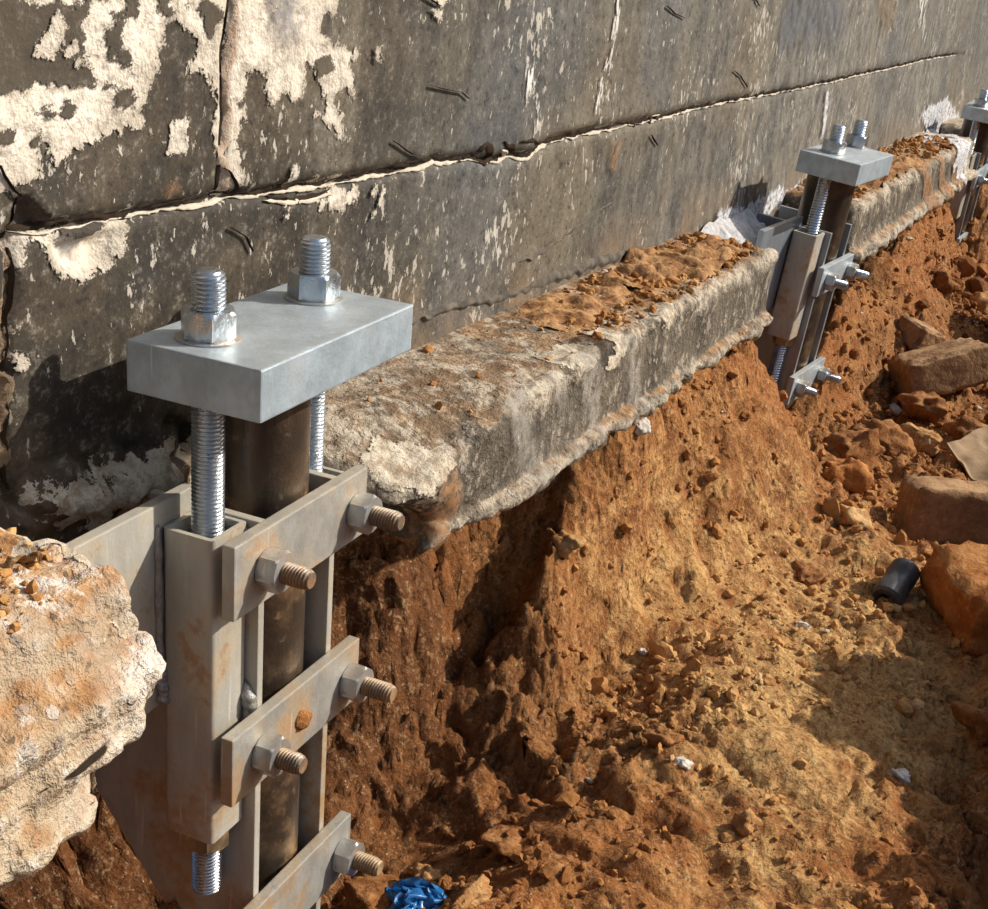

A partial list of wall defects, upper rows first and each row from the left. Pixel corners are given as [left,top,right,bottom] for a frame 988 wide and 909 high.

peeling [423,0,453,24]
peeling [521,56,541,152]
peeling [594,0,624,124]
peeling [0,0,361,307]
peeling [284,158,386,245]
crack [0,0,957,372]
peeling [2,322,31,372]
crack [0,403,10,490]